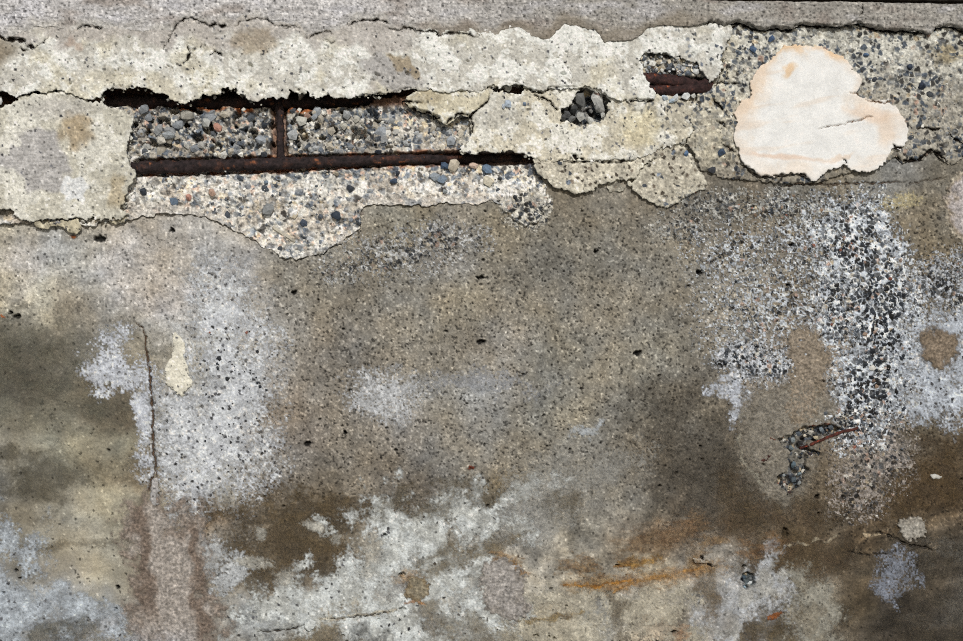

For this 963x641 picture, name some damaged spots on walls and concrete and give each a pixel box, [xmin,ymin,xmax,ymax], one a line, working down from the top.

crack [0,36,49,51]
rust [643,72,714,96]
crack [707,7,963,35]
rust [104,93,531,175]
flaking render [0,15,963,261]
leakage [880,191,923,208]
leakage [849,300,963,439]
crack [136,323,158,506]
leakage [74,251,845,641]
leakage [0,515,143,641]
rust [563,557,667,593]
leakage [869,544,924,608]